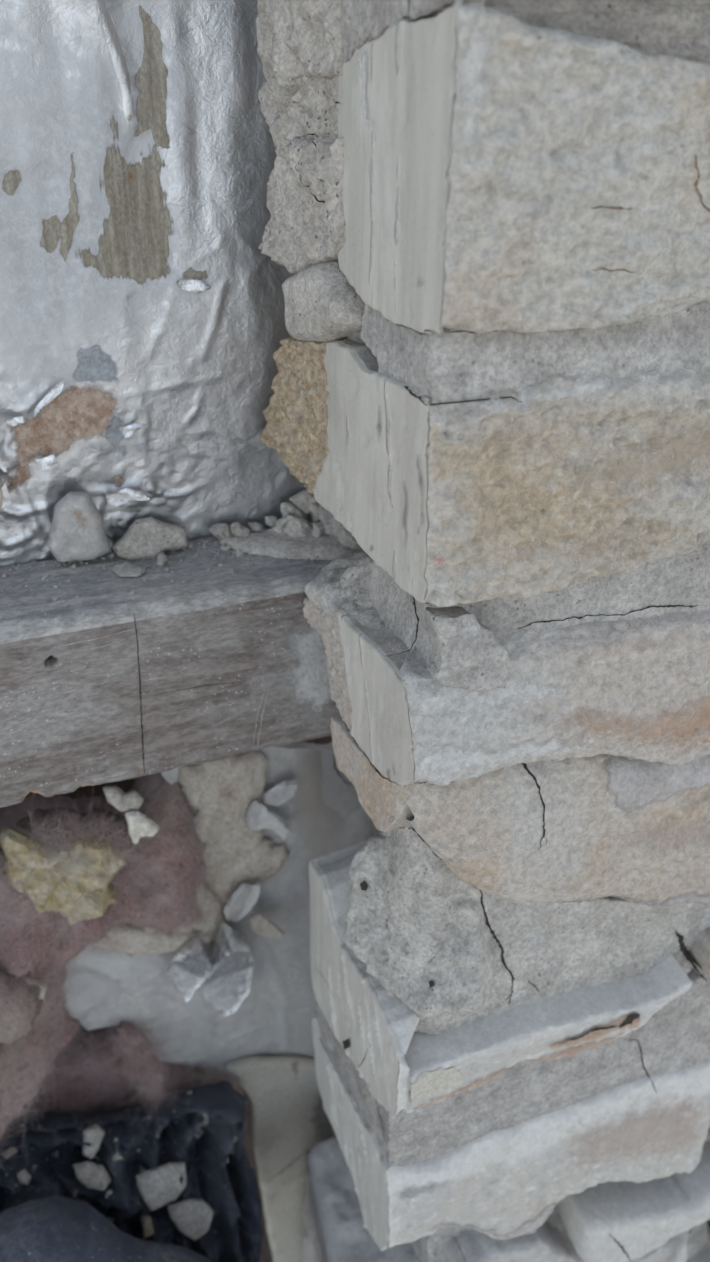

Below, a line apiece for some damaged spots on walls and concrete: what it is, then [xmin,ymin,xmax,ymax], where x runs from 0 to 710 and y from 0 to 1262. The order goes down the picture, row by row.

peeling [2,170,22,195]
peeling [40,5,211,293]
crack [694,155,710,213]
peeling [0,346,153,513]
crack [518,605,698,629]
crack [517,763,547,849]
crack [480,890,540,1005]
crack [675,931,707,982]